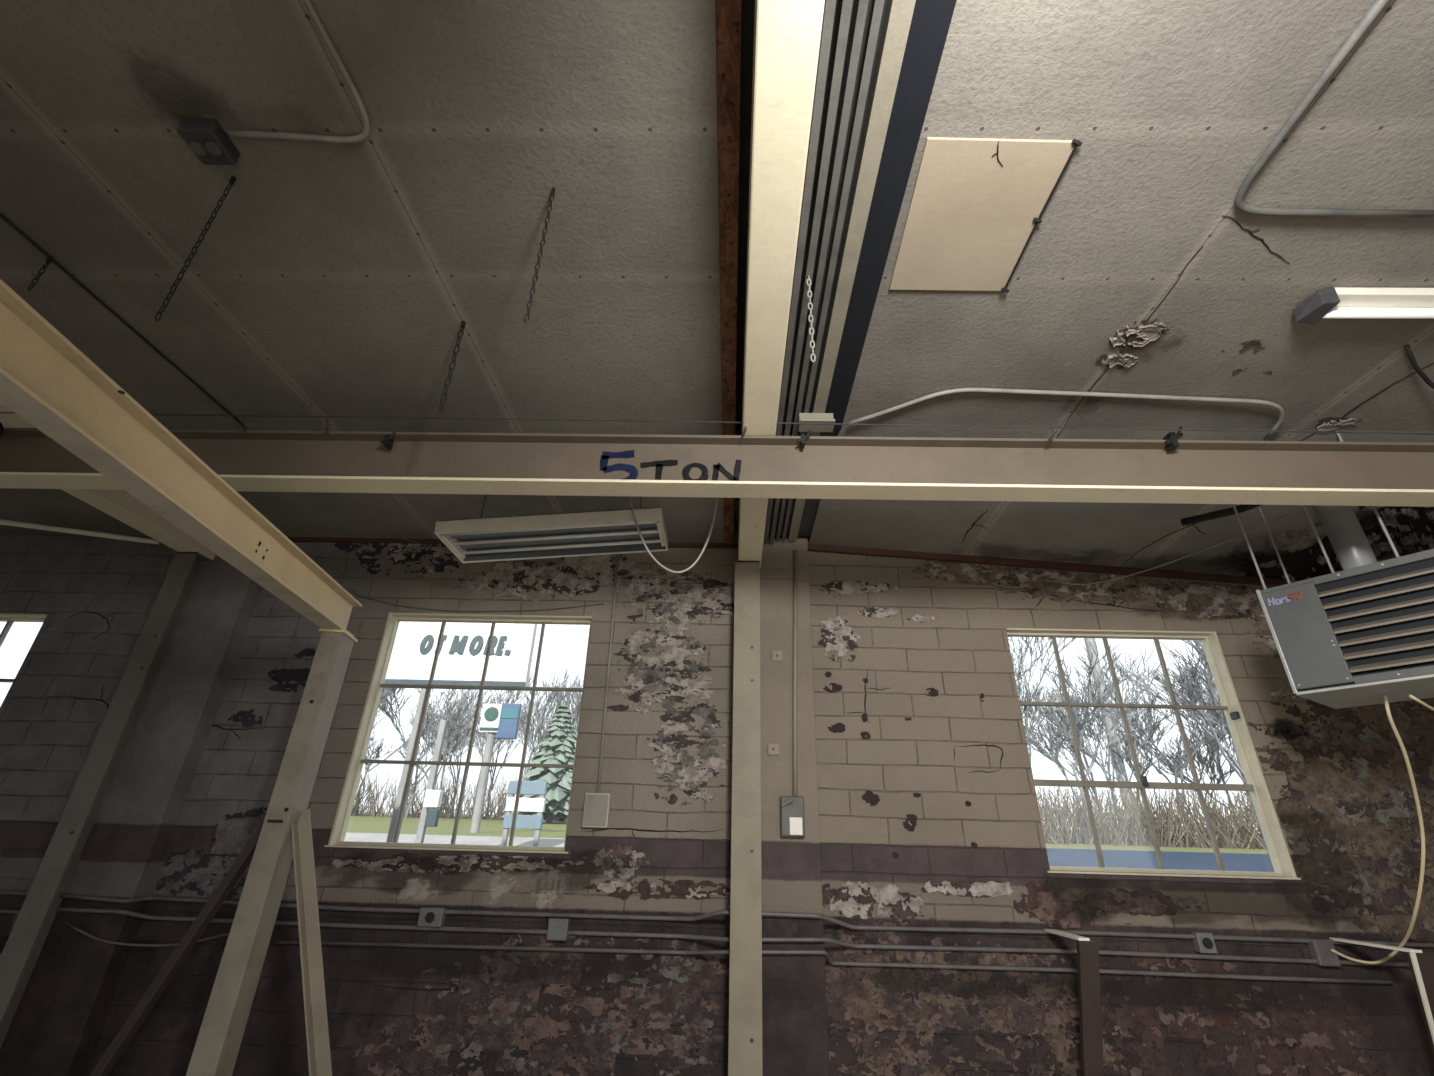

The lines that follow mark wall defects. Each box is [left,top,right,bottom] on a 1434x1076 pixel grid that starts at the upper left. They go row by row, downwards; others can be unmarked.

crack [1222,215,1289,263]
peeling [268,648,316,693]
peeling [334,543,734,807]
peeling [228,709,263,727]
peeling [828,713,871,740]
peeling [862,790,880,806]
peeling [903,814,918,831]
spalling [1248,689,1434,943]
peeling [151,807,267,904]
peeling [332,843,730,900]
flaking render [352,928,729,1076]
flaking render [822,880,1205,1076]